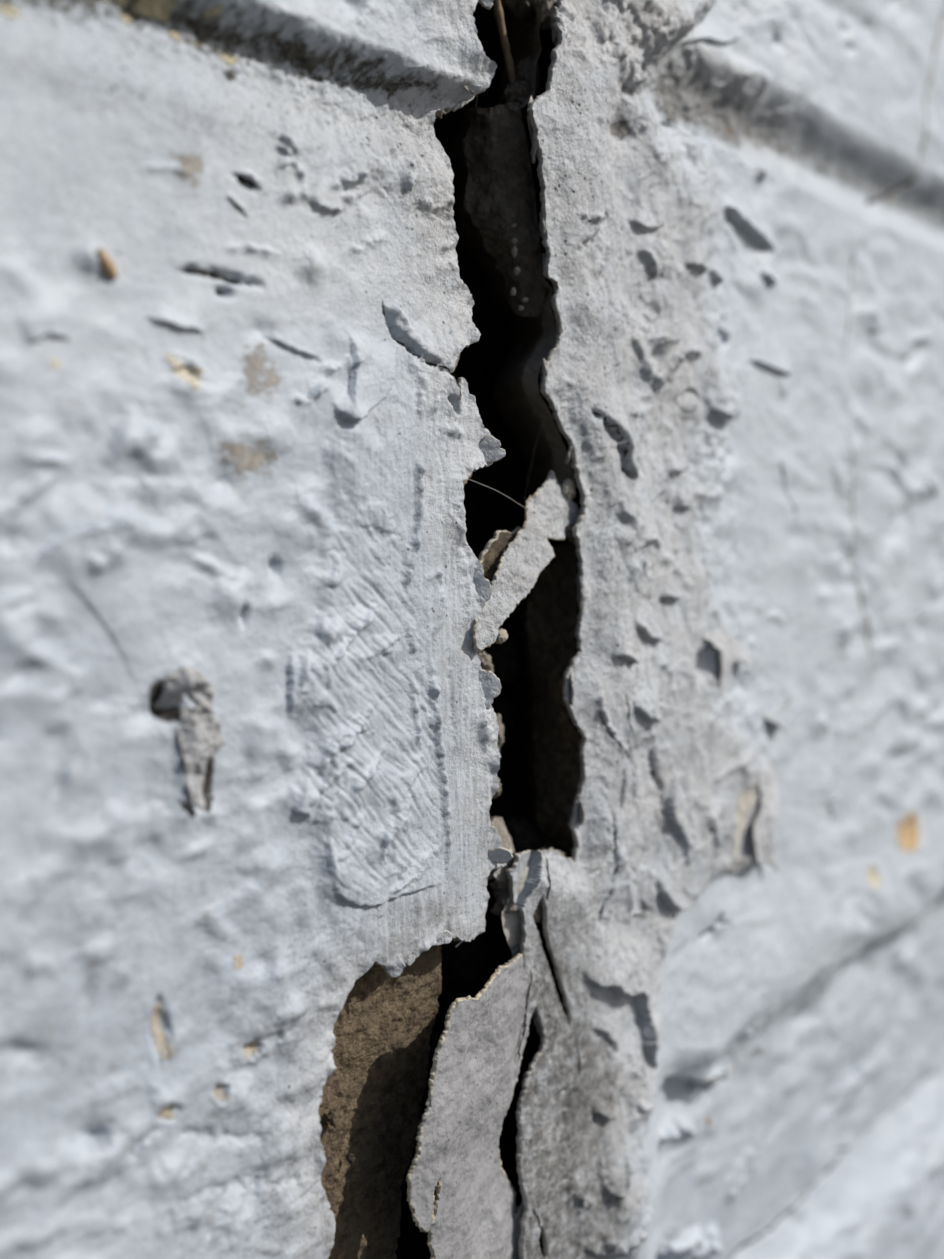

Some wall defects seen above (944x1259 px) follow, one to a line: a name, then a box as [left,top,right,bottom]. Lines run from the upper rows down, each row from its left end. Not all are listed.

spalling [318,945,529,1259]
crack [362,0,662,1259]